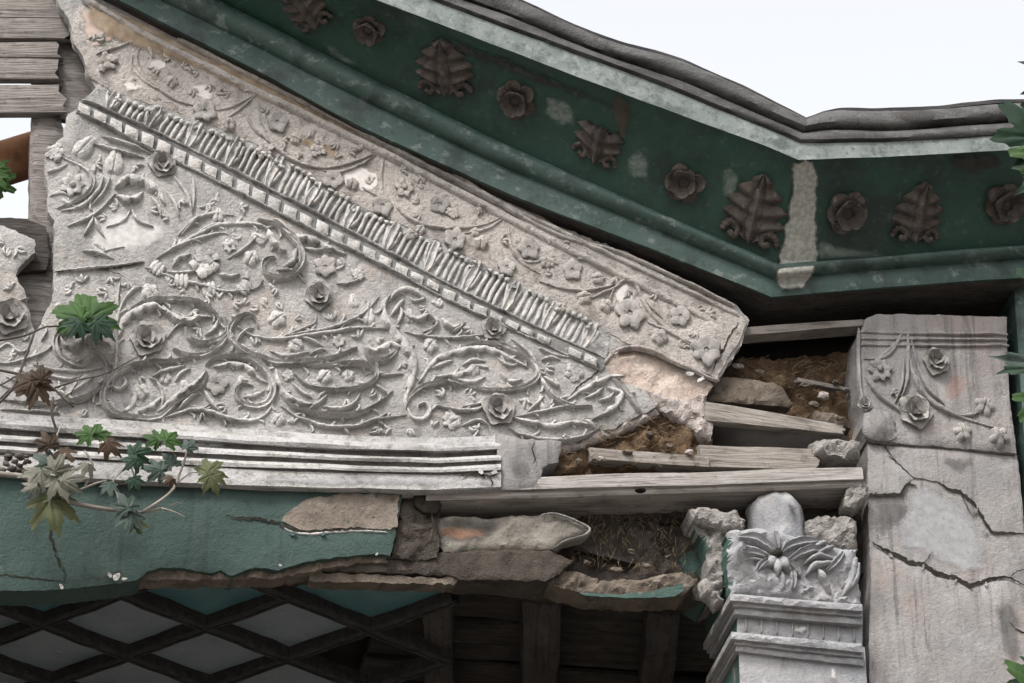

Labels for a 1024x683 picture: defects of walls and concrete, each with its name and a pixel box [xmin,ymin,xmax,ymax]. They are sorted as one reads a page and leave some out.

peeling [777,160,843,288]
spalling [561,345,720,454]
crack [869,456,913,496]
crack [939,482,1022,534]
crack [0,530,66,589]
spalling [686,525,726,582]
crack [873,542,1024,590]